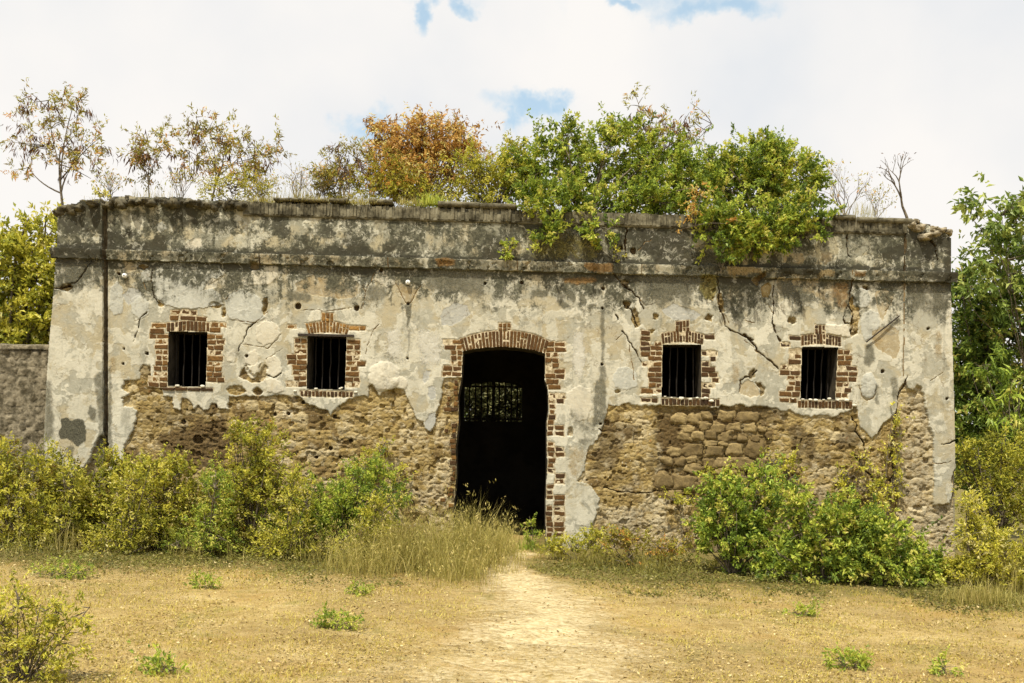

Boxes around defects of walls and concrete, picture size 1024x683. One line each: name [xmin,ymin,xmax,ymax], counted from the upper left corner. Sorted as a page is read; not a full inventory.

damp [45,369,113,457]
flaking render [226,355,282,396]
crack [238,312,282,378]
damp [290,263,329,276]
peeling [424,412,436,431]
crack [613,228,653,380]
damp [636,252,730,308]
crack [717,274,781,369]
crack [843,234,854,334]
crack [851,232,943,486]